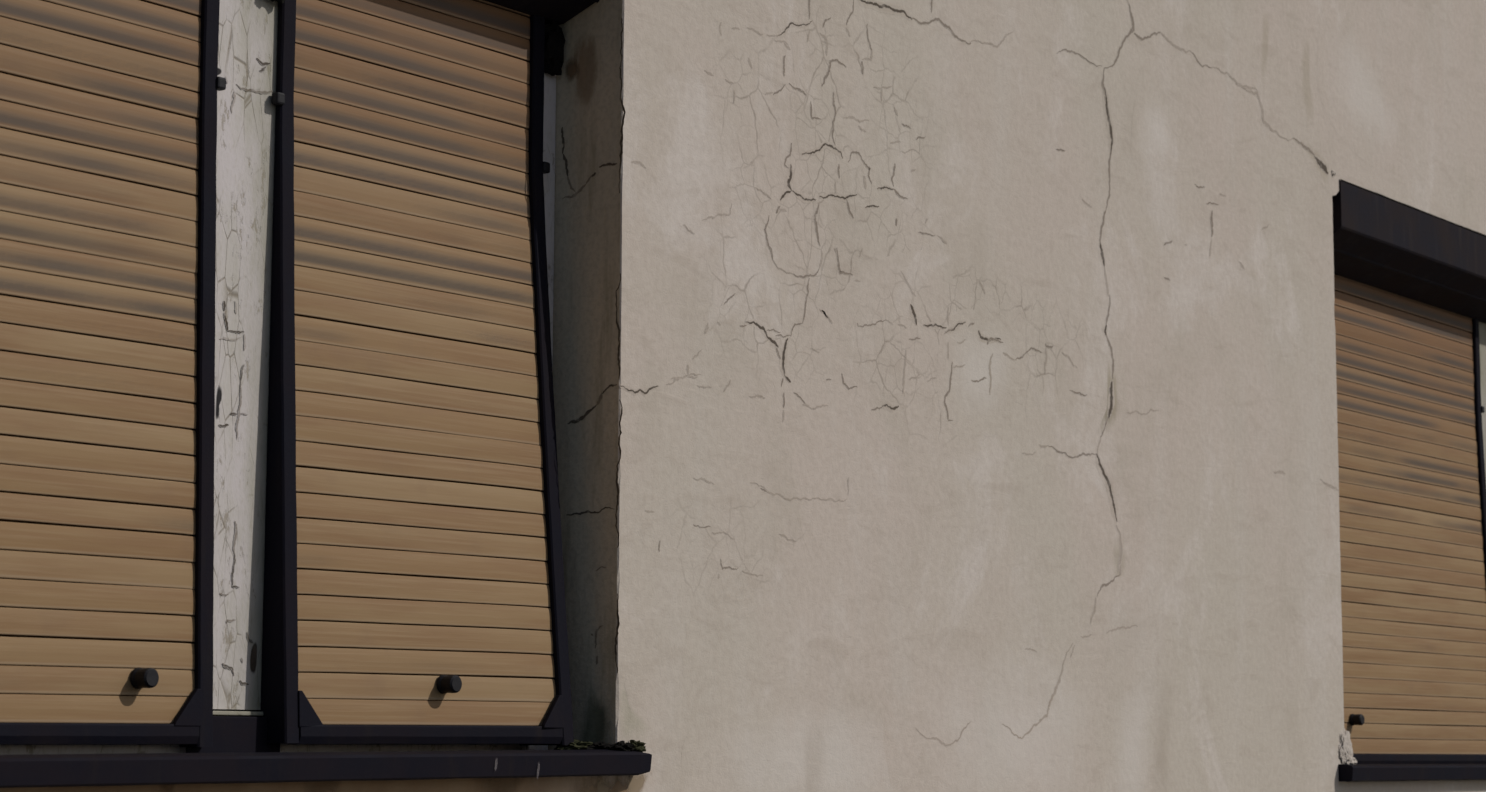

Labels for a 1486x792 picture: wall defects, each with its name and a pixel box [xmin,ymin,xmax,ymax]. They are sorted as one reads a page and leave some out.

crack [561,18,646,199]
crack [704,0,1012,144]
crack [566,273,857,673]
crack [916,0,1328,746]